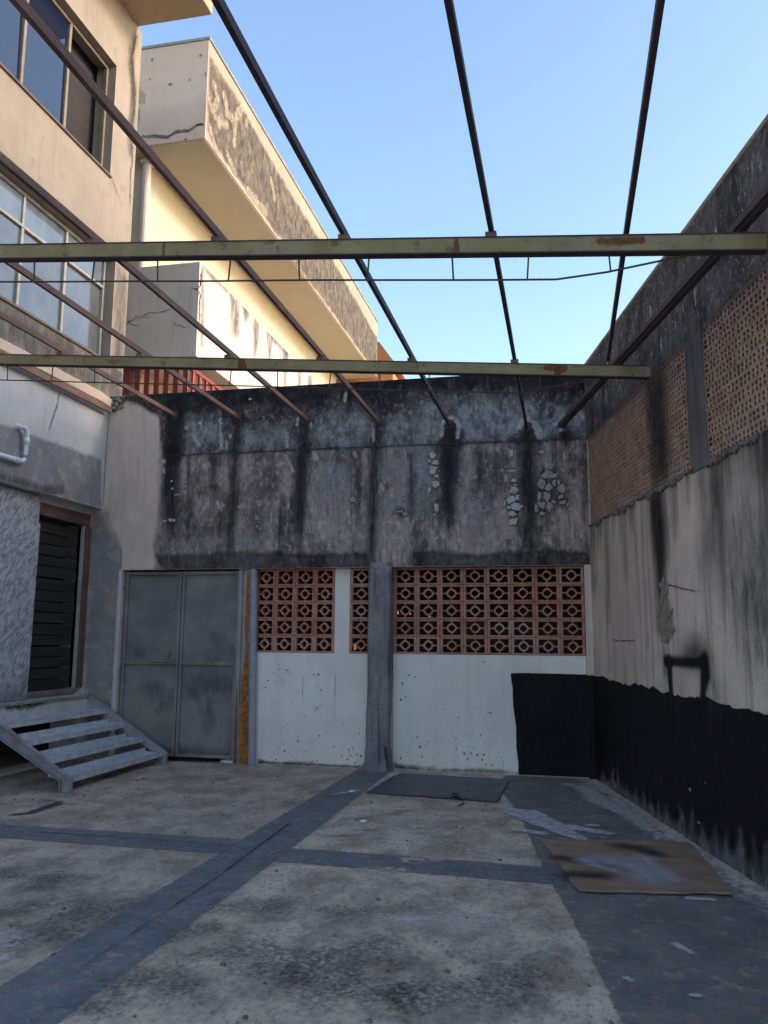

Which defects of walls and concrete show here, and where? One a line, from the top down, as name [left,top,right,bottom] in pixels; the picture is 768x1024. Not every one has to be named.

crack [113,36,204,207]
water stain [209,61,318,239]
water stain [684,121,768,233]
corrosion [597,236,644,245]
water stain [63,208,768,569]
corrosion [544,365,567,375]
flaking render [428,450,439,516]
flaking render [482,449,571,525]
water stain [651,492,667,601]
corrosion [233,573,250,764]